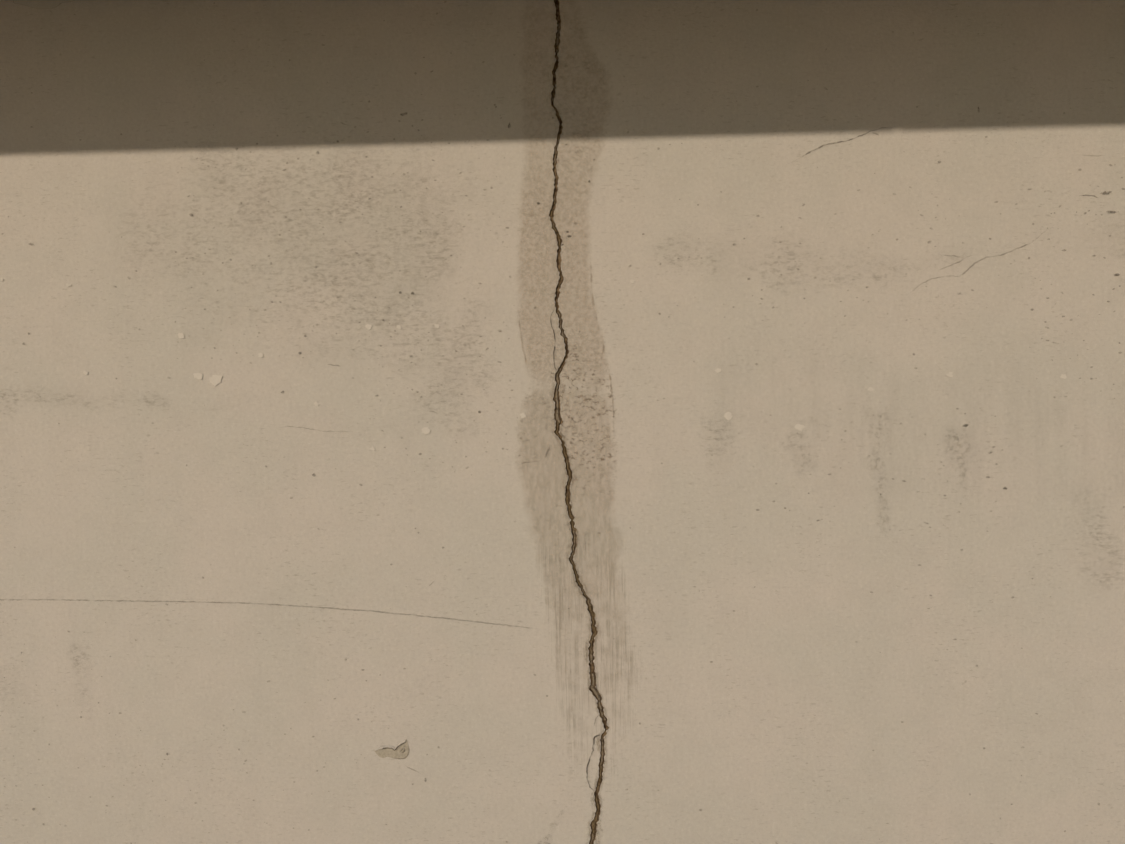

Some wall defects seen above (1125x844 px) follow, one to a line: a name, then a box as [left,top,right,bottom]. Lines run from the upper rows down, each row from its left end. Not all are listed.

peeling [374,739,409,759]
crack [549,0,609,844]